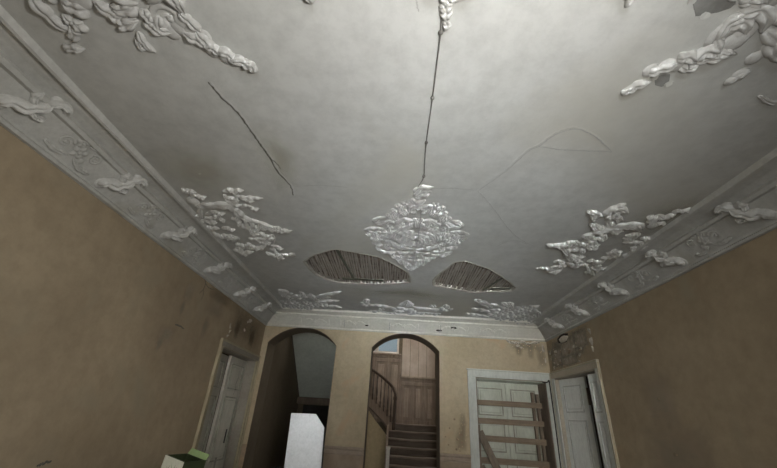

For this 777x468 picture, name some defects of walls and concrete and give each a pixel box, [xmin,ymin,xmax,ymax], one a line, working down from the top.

crack [208,82,295,195]
spalling [303,249,411,285]
spalling [432,261,517,294]